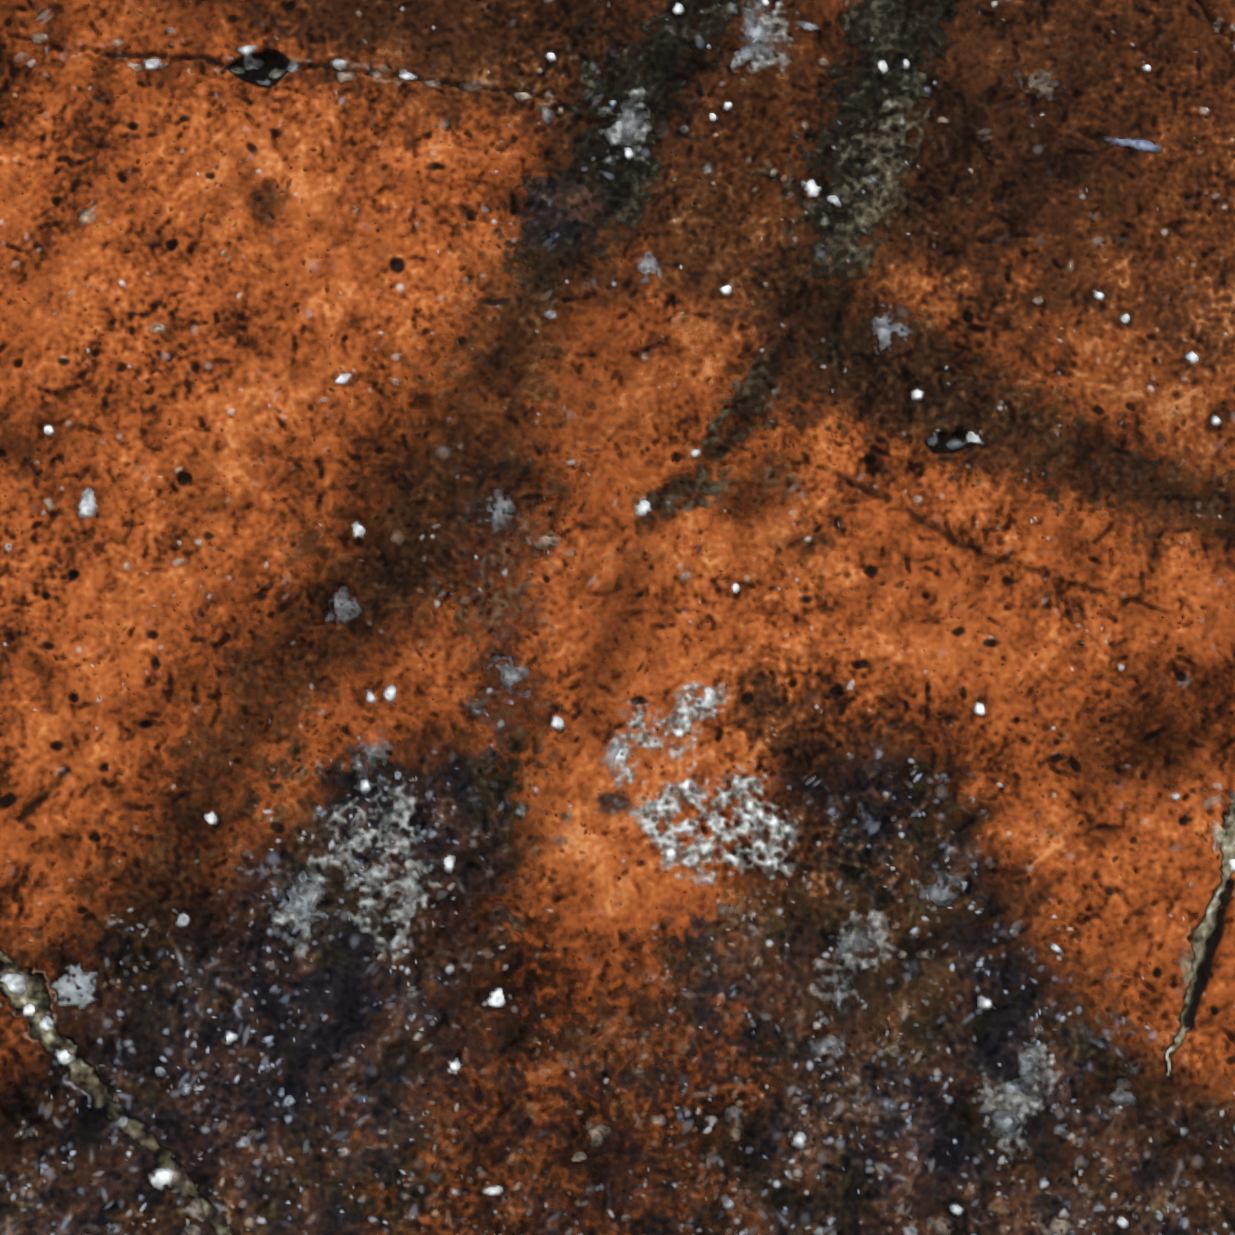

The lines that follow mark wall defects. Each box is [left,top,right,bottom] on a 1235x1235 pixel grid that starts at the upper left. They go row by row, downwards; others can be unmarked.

crack [15,35,63,51]
crack [105,45,257,70]
crack [293,59,540,97]
crack [19,769,69,820]
crack [1165,803,1235,1076]
crack [0,950,231,1235]